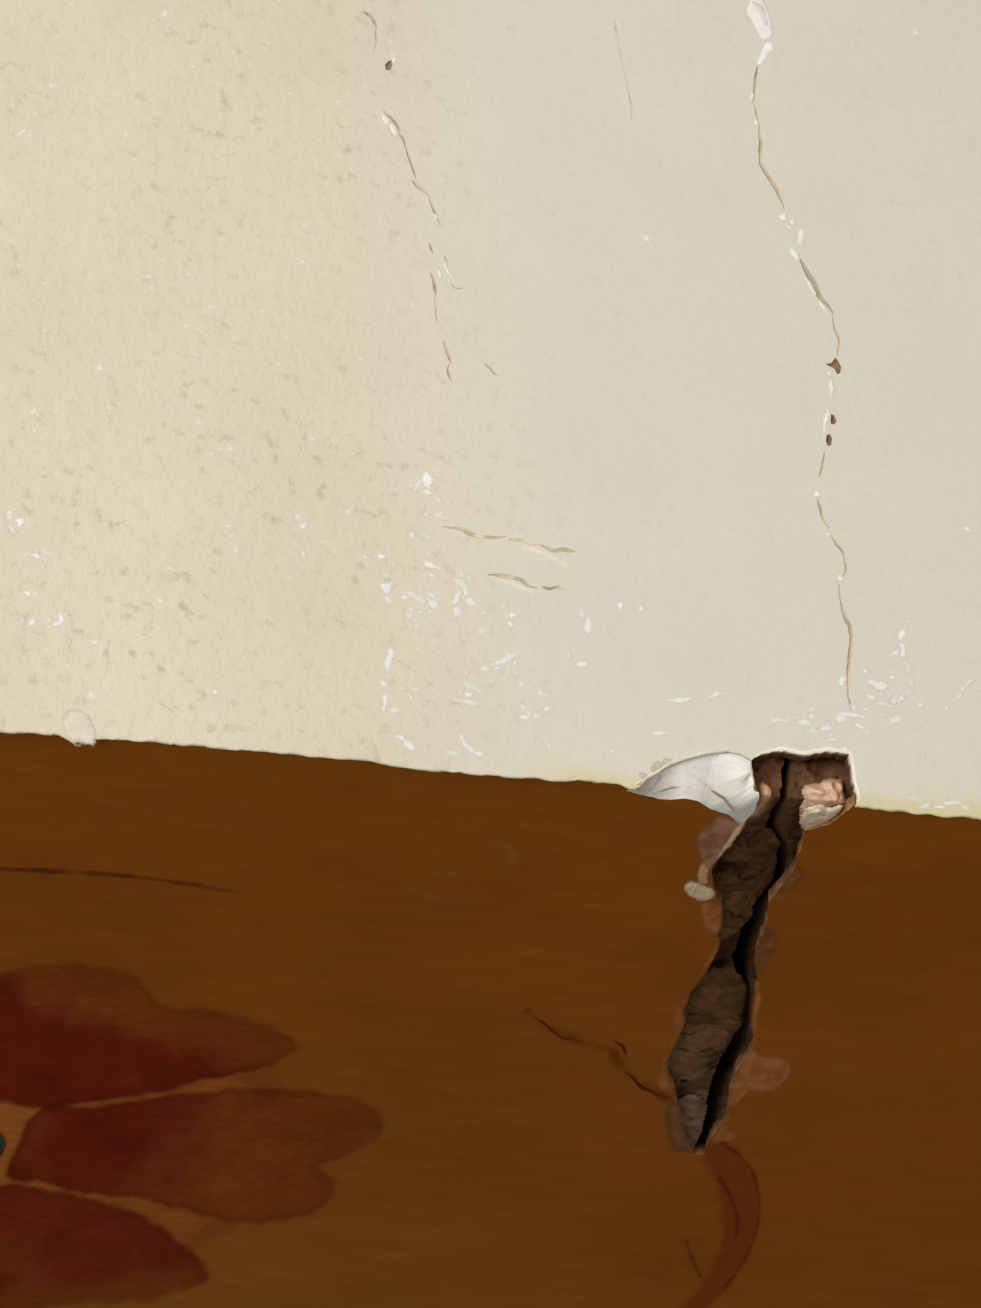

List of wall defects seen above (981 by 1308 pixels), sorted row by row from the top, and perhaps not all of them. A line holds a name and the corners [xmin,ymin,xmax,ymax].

crack [749,65,853,709]
flaking render [626,750,759,825]